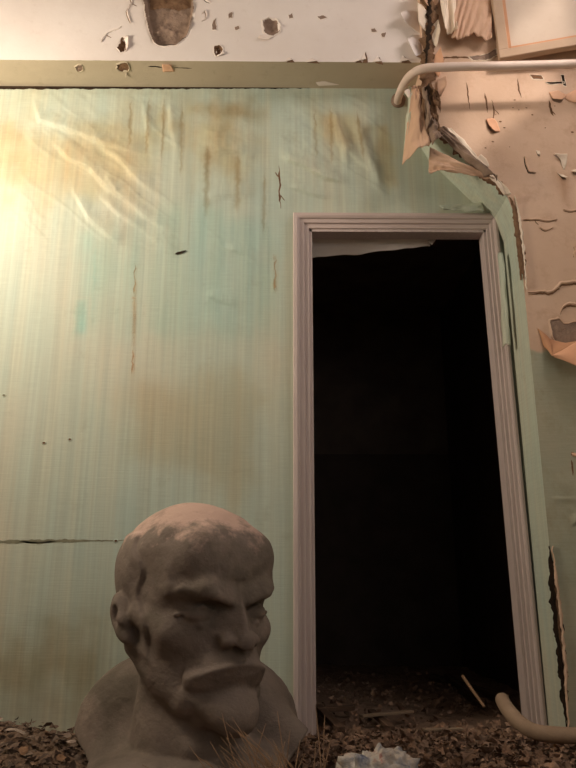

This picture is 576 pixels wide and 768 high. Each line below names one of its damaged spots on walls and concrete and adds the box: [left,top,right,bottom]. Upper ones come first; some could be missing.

flaking render [143,0,194,48]
flaking render [258,13,294,40]
flaking render [400,0,447,97]
flaking render [468,49,498,62]
peeling [529,74,567,103]
peeling [478,114,505,167]
peeling [498,252,511,347]
peeling [528,279,576,295]
flaking render [548,302,576,343]
crack [0,537,124,545]